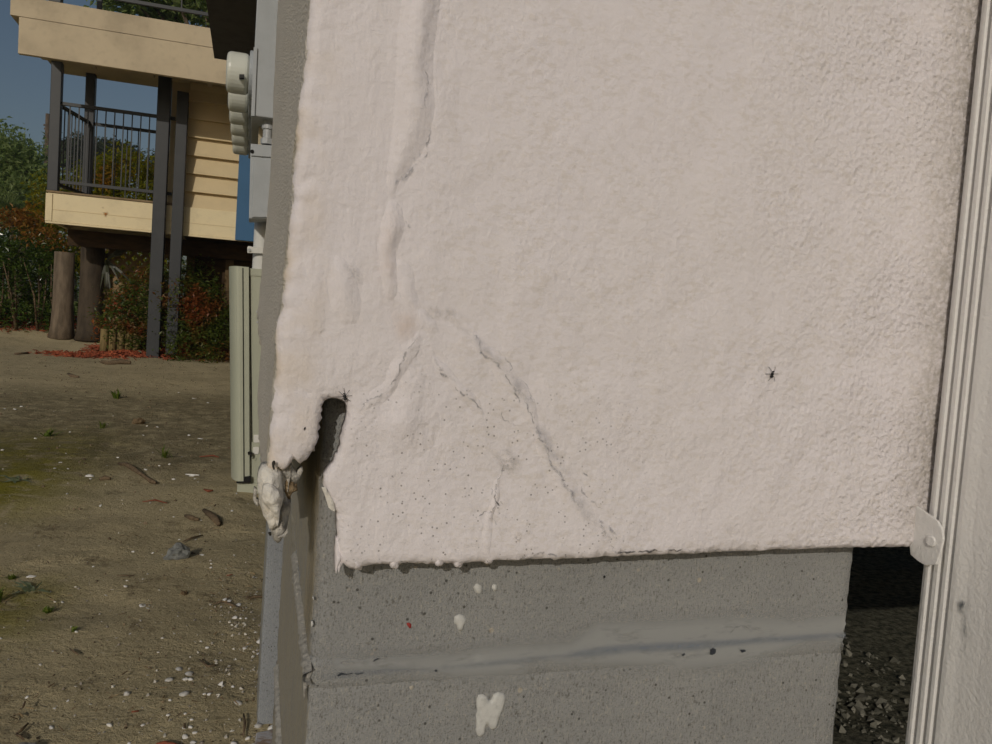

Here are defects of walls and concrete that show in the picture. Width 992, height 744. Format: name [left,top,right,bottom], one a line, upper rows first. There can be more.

flaking render [253,461,303,543]
peeling [322,487,335,511]